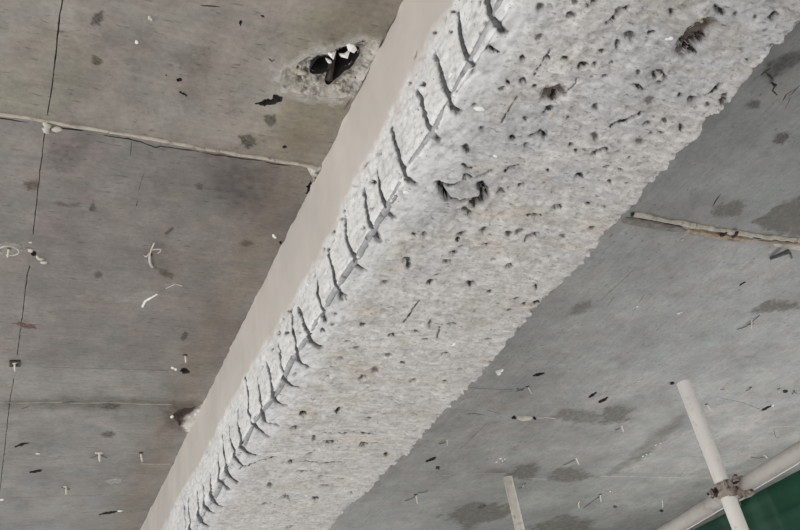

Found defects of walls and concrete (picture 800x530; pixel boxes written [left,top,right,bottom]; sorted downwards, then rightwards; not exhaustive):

crack [33,0,63,233]
crack [17,266,30,355]
spalling [184,0,507,530]
crack [0,379,29,488]
spalling [170,404,203,437]